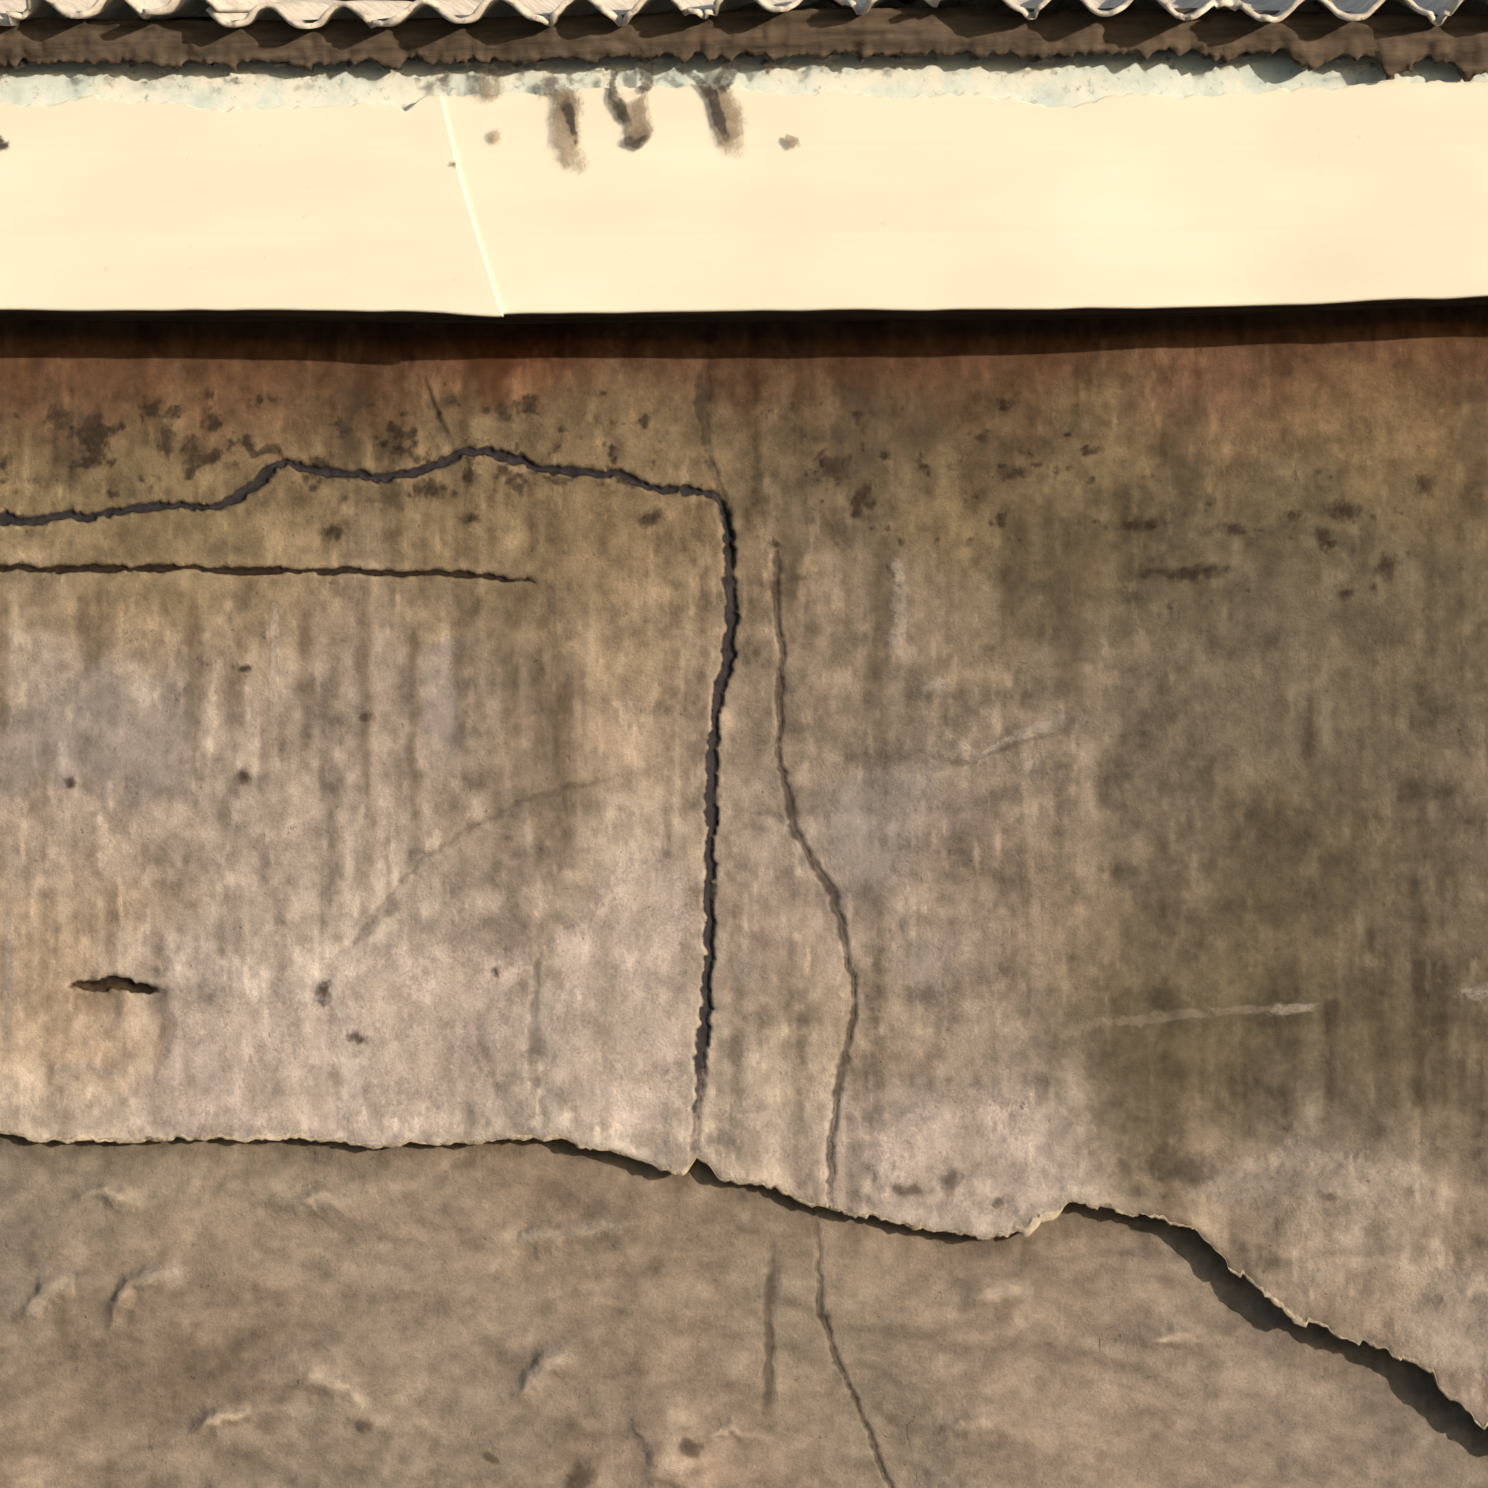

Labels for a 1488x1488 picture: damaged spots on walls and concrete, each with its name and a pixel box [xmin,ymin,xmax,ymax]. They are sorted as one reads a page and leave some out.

leakage [1202,52,1251,70]
leakage [47,407,126,468]
leakage [143,392,253,480]
leakage [376,412,475,496]
leakage [497,442,576,493]
crack [696,379,709,445]
leakage [892,562,906,645]
crack [0,445,738,1149]
crack [773,552,856,1201]
peeling [0,853,1488,1430]
crack [765,1271,775,1396]
crack [817,1280,892,1488]